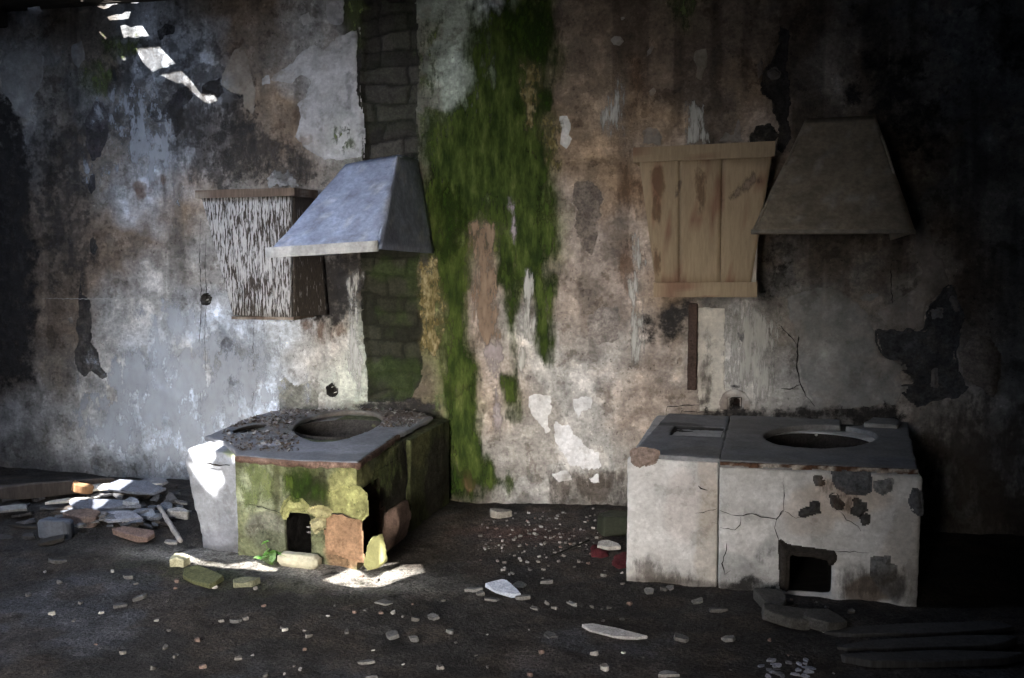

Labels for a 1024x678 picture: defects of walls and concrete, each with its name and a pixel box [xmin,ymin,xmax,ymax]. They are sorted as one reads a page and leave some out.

spalling [749,26,791,153]
damp [33,24,316,294]
spalling [68,278,113,379]
damp [430,220,628,507]
crack [779,325,814,405]
spalling [875,284,969,407]